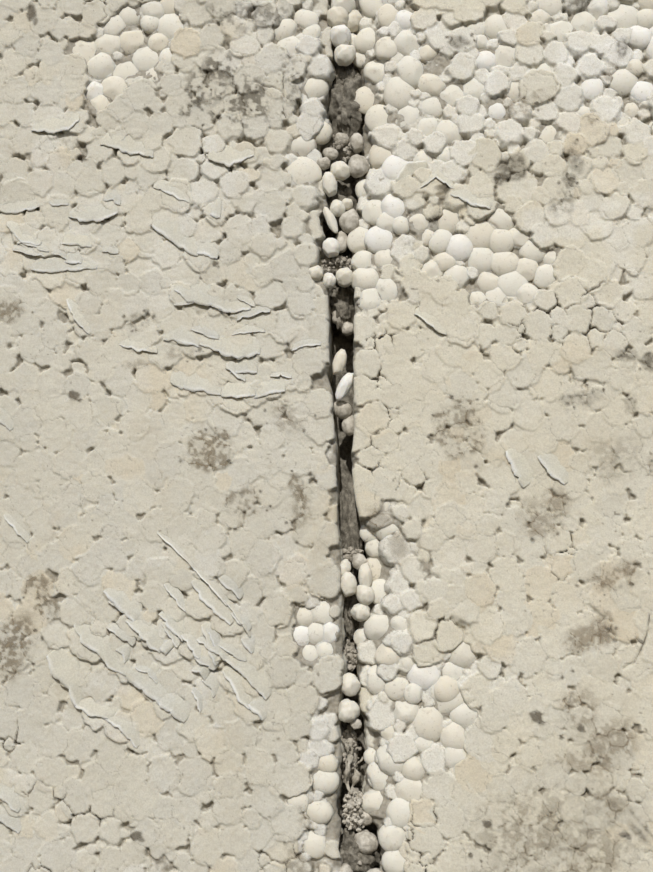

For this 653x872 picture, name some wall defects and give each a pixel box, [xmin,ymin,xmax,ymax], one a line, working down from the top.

spalling [530,0,653,124]
peeling [31,112,80,134]
peeling [100,133,154,158]
peeling [208,145,254,167]
peeling [0,190,121,273]
peeling [152,216,219,266]
peeling [66,298,91,335]
peeling [119,281,292,399]
crack [539,284,622,345]
peeling [73,532,272,723]
peeling [46,648,140,749]
spalling [287,754,340,859]